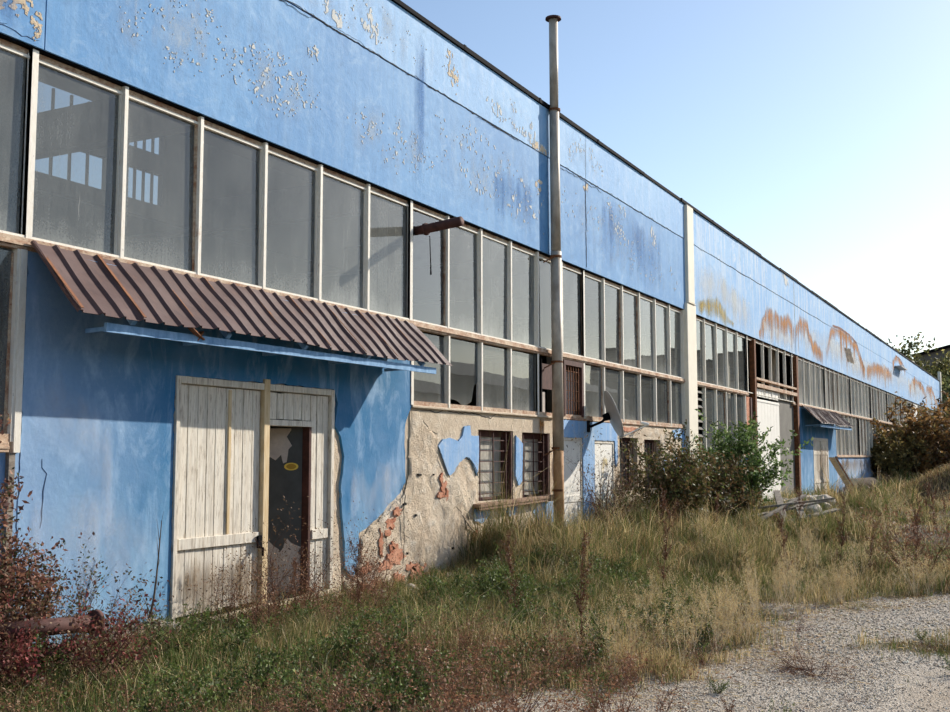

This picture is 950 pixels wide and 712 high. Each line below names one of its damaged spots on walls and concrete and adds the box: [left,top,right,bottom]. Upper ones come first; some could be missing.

peeling [0,0,43,41]
peeling [324,0,411,52]
peeling [117,0,320,117]
peeling [442,48,459,95]
peeling [347,112,449,174]
peeling [435,114,544,223]
peeling [486,99,549,156]
rust [699,300,734,324]
rust [759,309,823,360]
rust [829,325,904,376]
flaking render [333,411,539,594]